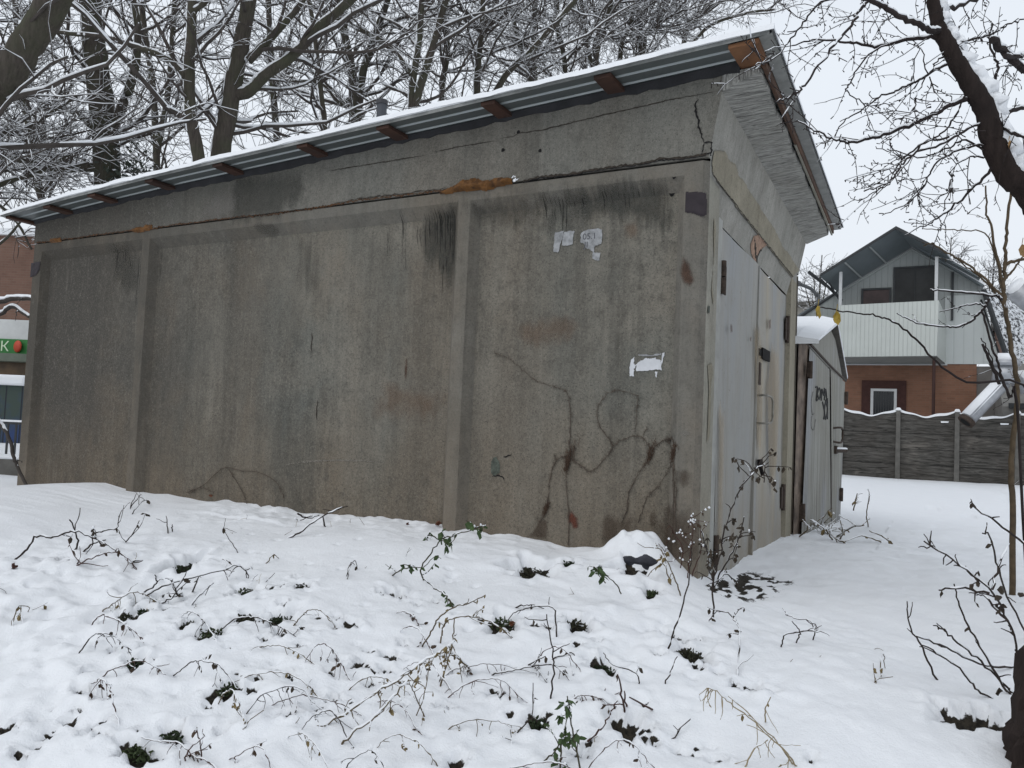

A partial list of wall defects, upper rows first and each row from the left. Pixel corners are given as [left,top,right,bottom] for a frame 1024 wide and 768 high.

crack [331,90,793,277]